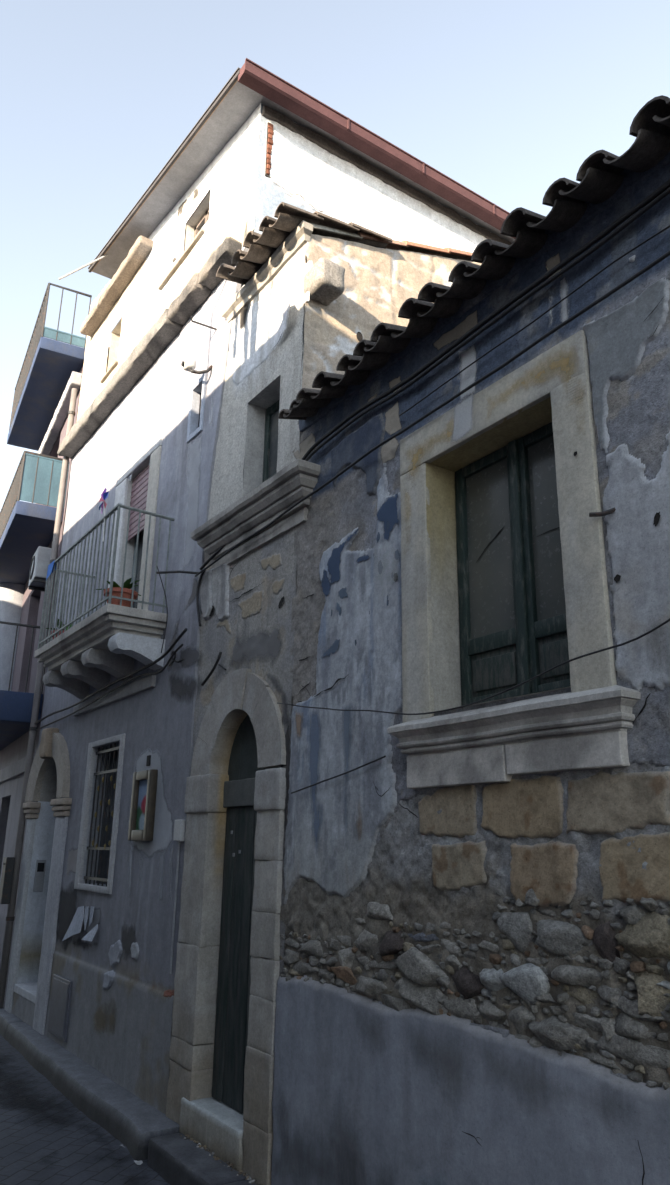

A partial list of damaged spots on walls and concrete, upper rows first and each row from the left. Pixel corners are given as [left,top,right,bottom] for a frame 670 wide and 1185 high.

spalling [265,122,337,216]
peeling [233,261,312,386]
peeling [433,310,478,350]
peeling [546,253,561,279]
peeling [582,277,670,691]
spalling [279,376,670,1090]